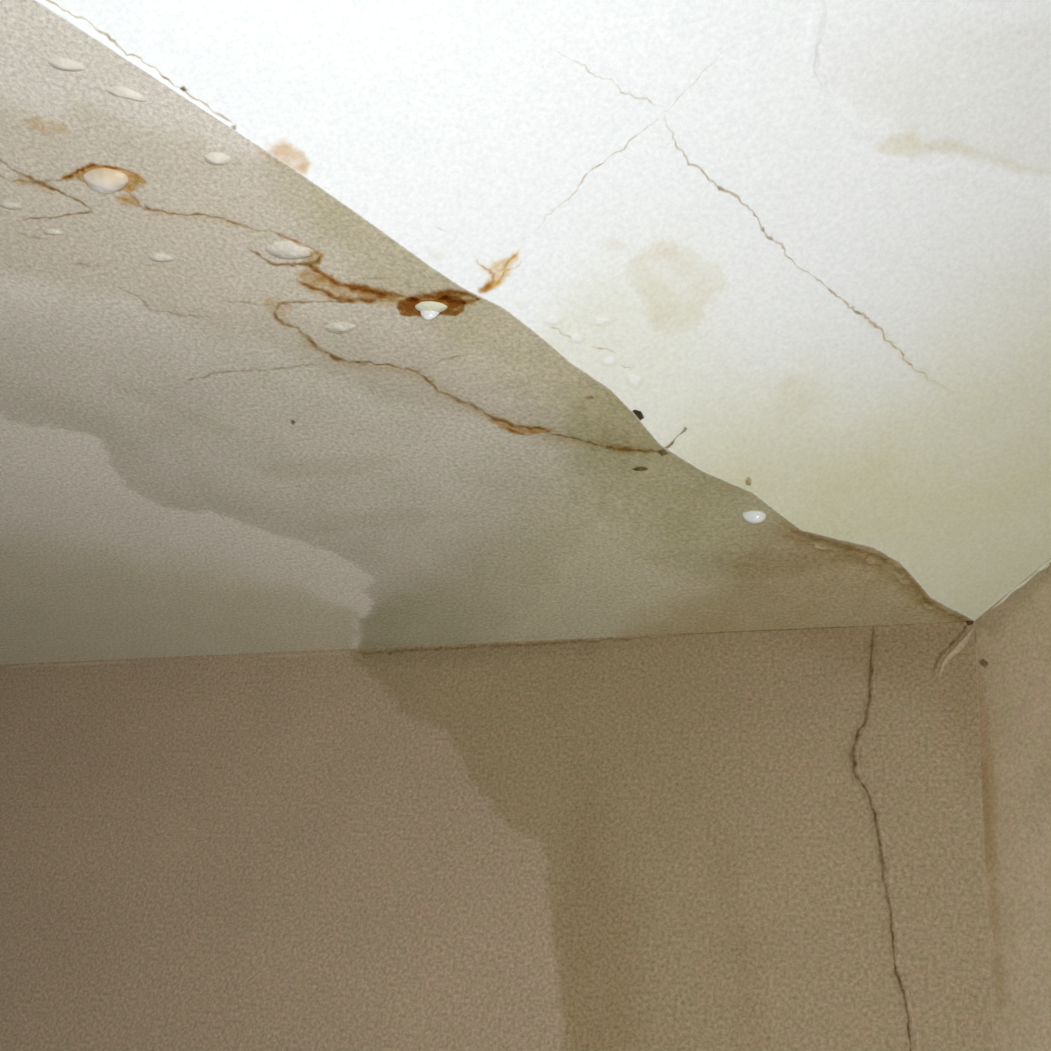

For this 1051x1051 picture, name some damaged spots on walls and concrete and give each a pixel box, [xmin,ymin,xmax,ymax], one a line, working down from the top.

crack [304,269,385,302]
rust [398,297,465,316]
crack [411,290,479,304]